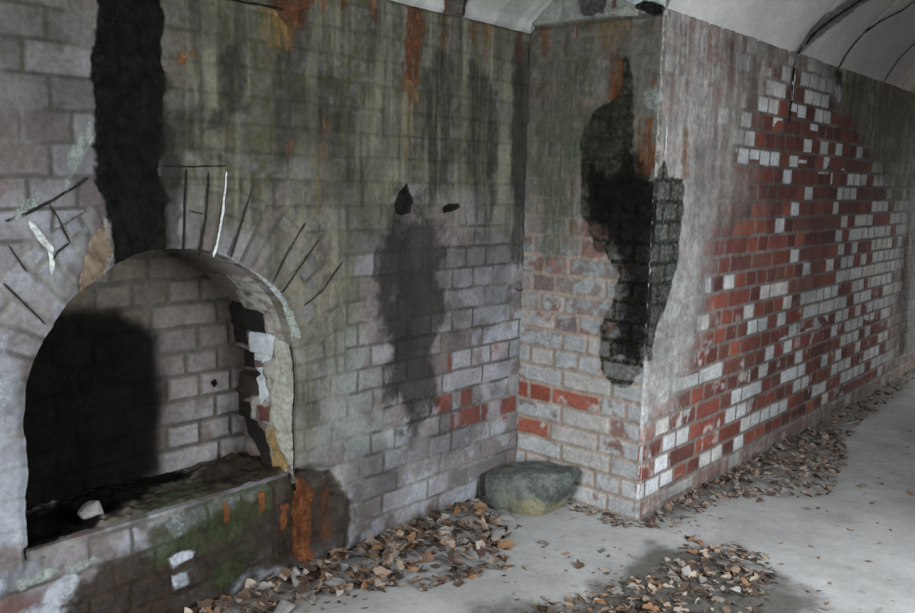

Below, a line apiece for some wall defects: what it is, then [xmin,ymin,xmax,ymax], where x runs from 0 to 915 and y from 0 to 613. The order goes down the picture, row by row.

crack [232,0,285,11]
corrosion [404,4,425,103]
crack [789,0,868,122]
crack [835,1,915,85]
damp [69,0,181,265]
corrosion [637,80,667,176]
damp [15,194,39,221]
flaking render [218,253,301,474]
damp [16,477,294,613]
corrosion [276,469,350,569]